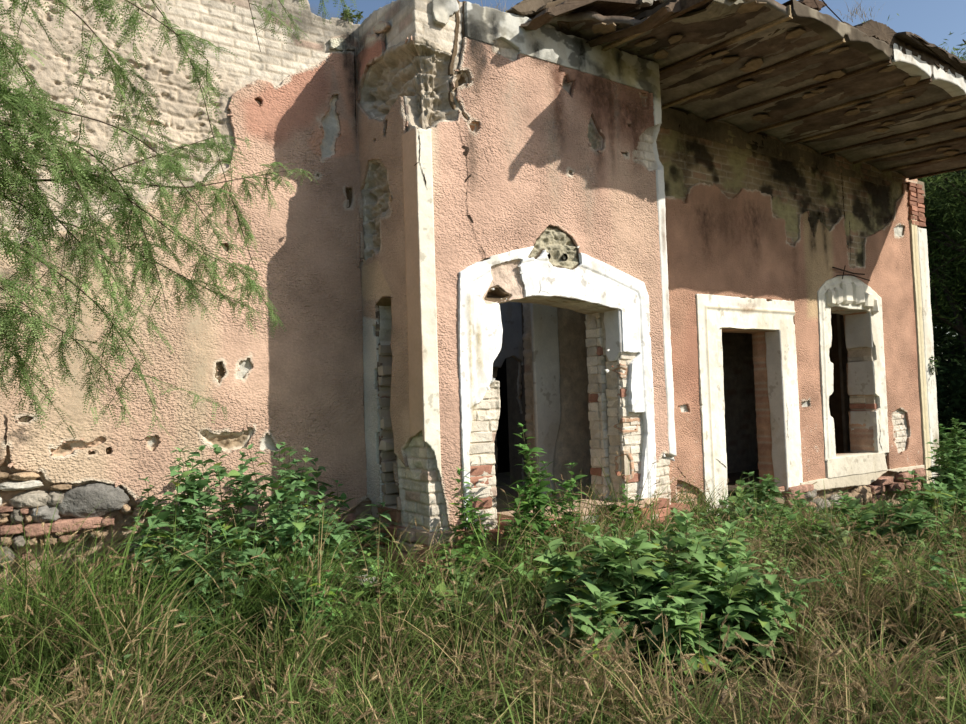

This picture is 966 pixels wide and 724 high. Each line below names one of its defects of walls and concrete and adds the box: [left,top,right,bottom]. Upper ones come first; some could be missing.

flaking render [0,0,360,248]
spalling [359,35,481,133]
crack [448,0,486,260]
leakage [471,14,498,80]
flaking render [619,0,903,268]
flaking render [346,157,392,264]
flaking render [482,225,580,305]
flaking render [215,358,252,382]
flaking render [50,437,115,457]
flaking render [200,424,277,453]
flaking render [892,409,908,453]